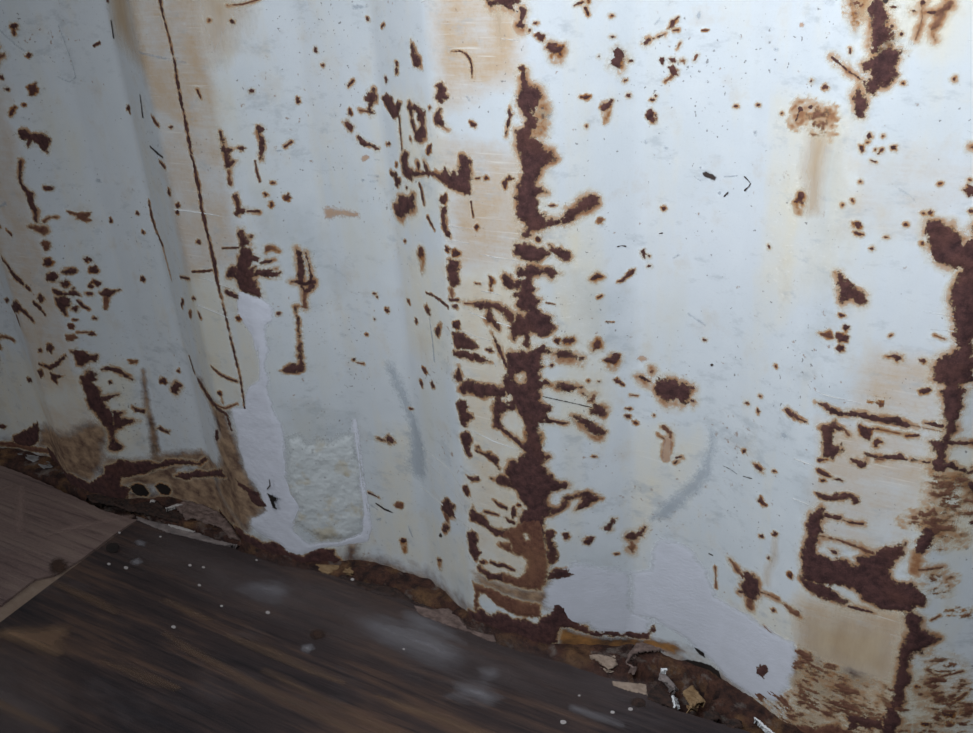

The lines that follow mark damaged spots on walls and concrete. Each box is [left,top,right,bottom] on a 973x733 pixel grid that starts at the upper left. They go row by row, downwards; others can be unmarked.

corrosion [8,82,39,118]
corrosion [410,40,423,70]
corrosion [573,0,591,17]
corrosion [780,99,840,216]
corrosion [858,132,897,153]
corrosion [827,0,957,119]
corrosion [0,124,371,562]
corrosion [342,60,697,654]
corrosion [755,177,973,733]